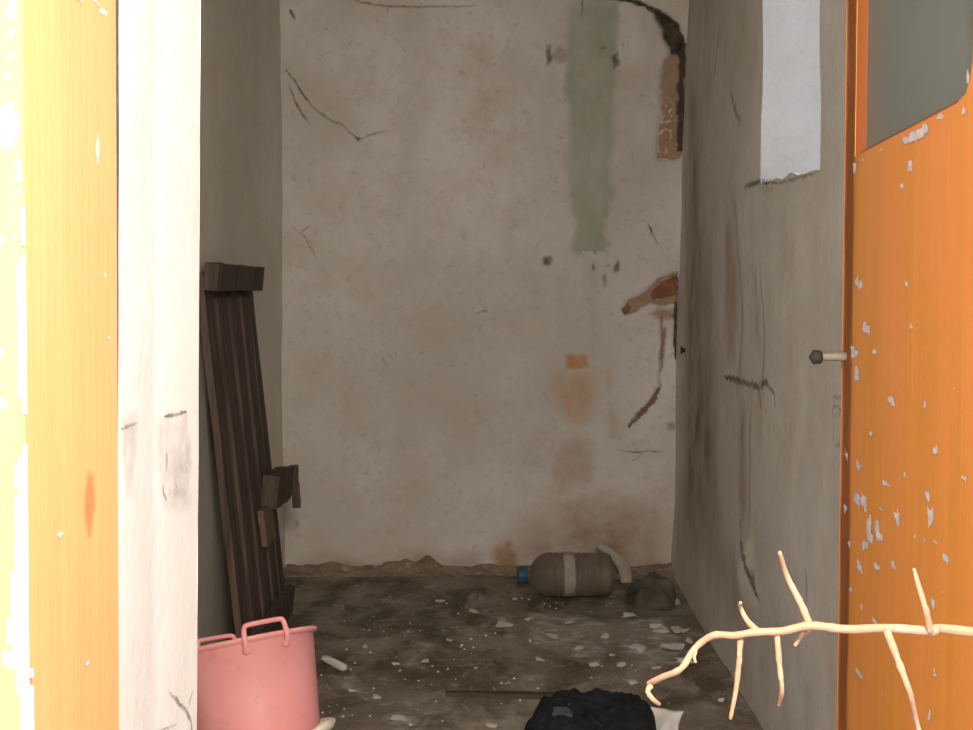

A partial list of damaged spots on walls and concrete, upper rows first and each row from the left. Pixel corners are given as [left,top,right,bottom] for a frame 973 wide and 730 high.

crack [618,0,684,54]
flaking render [656,43,686,162]
peeling [902,113,945,144]
flaking render [622,273,678,318]
crack [661,271,678,359]
water stain [285,0,807,730]
crack [628,388,660,427]
crack [724,376,774,394]
peeling [851,346,860,382]
crack [740,520,757,597]
peeling [844,489,900,574]
peeling [914,491,949,565]